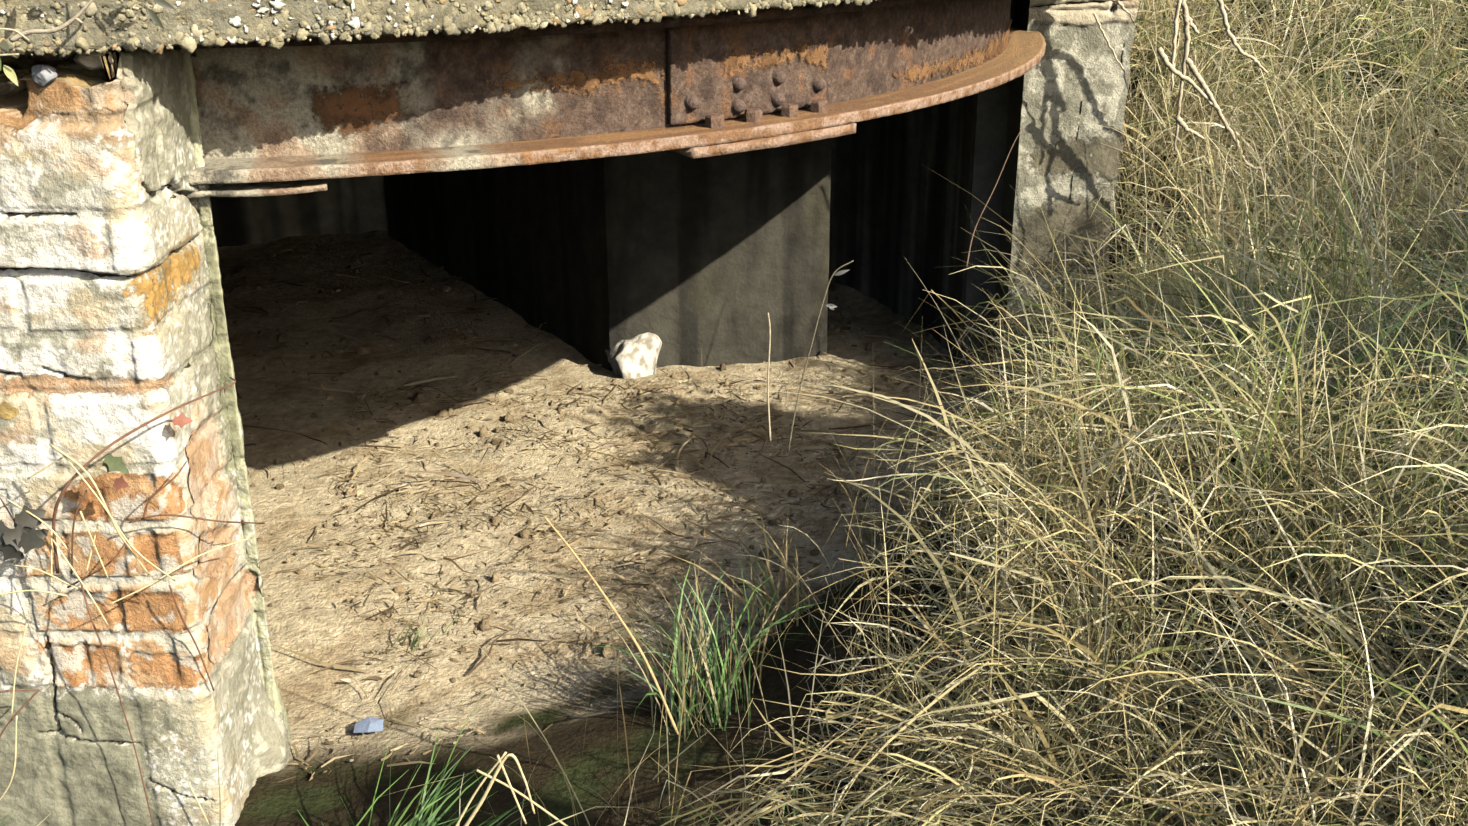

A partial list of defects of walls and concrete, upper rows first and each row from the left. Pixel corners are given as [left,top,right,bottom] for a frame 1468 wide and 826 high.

corrosion [486,57,665,96]
corrosion [723,39,828,78]
corrosion [893,18,1011,85]
corrosion [311,77,408,140]
corrosion [186,179,327,199]
spalling [45,408,261,691]